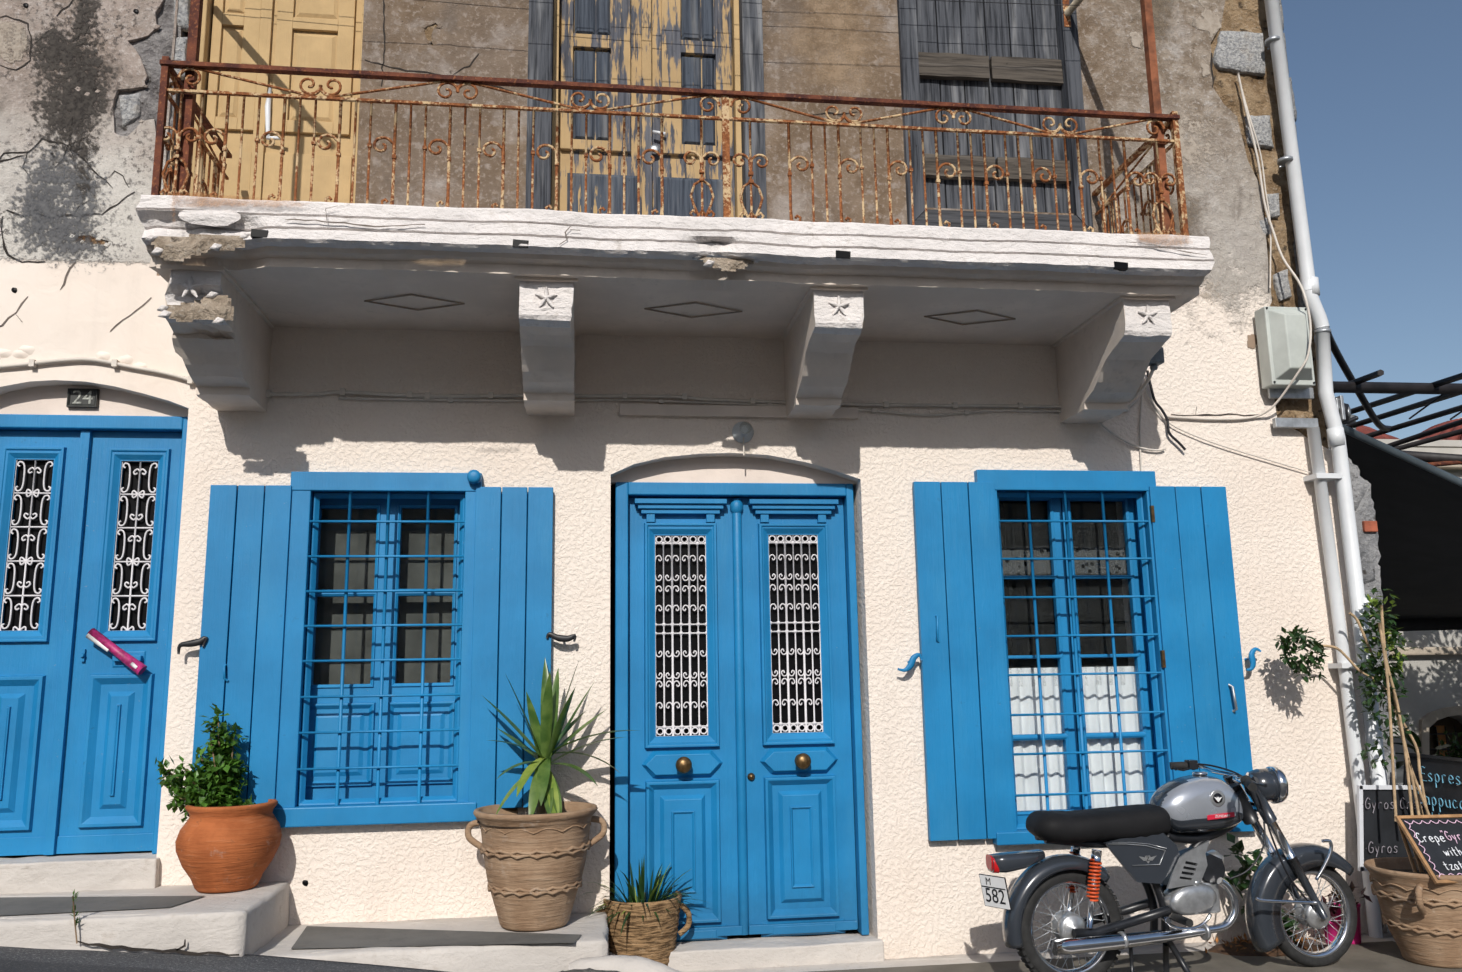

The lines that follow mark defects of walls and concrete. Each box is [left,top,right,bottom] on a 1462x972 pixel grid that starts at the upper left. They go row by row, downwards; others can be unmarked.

damp [0,0,121,268]
peeling [1129,32,1144,48]
rust [1138,233,1187,243]
flaking render [1139,0,1328,449]